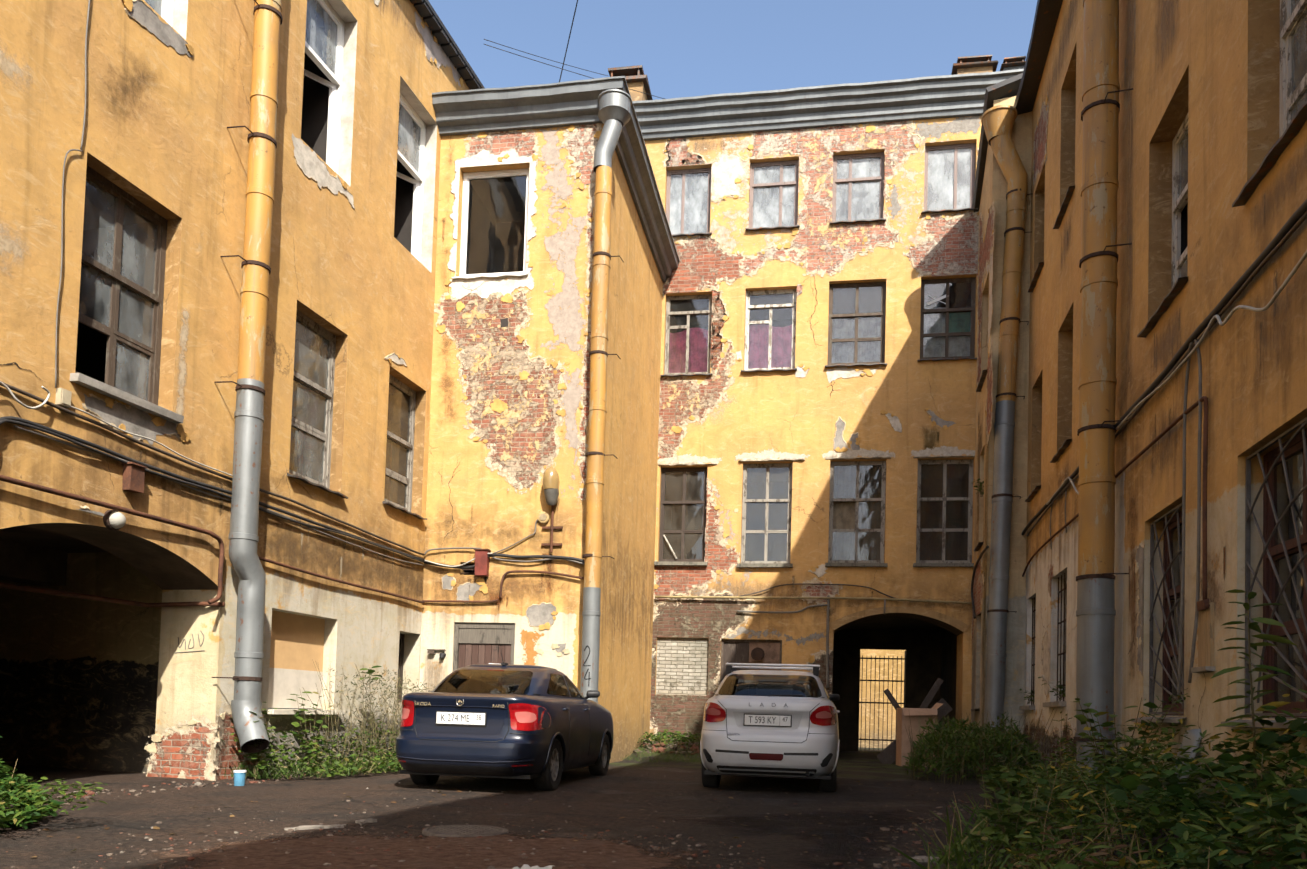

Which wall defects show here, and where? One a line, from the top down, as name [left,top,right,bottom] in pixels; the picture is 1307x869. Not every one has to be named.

spalling [292,133,355,209]
flaking render [1032,93,1049,185]
flaking render [434,123,602,501]
flaking render [657,120,995,466]
spalling [520,602,570,665]
flaking render [650,479,757,743]
flaking render [806,646,833,694]
flaking render [801,564,843,608]
flaking render [143,703,264,781]